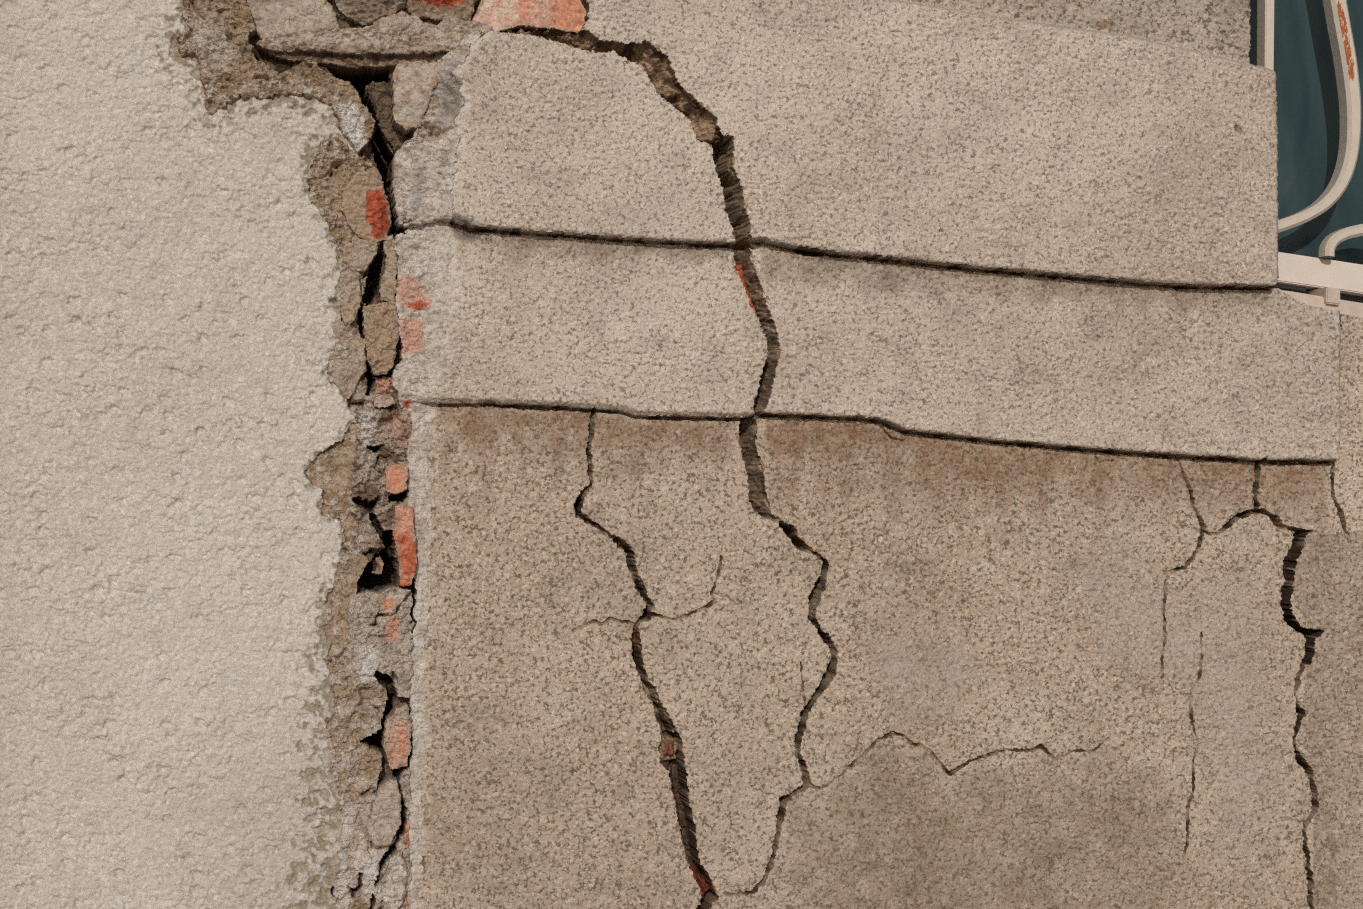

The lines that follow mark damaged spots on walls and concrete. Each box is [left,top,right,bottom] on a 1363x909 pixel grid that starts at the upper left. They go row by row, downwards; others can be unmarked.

crack [327,67,412,396]
crack [365,443,385,454]
crack [352,488,411,593]
flaking render [176,0,589,909]
crack [438,27,1352,909]
crack [350,670,413,909]